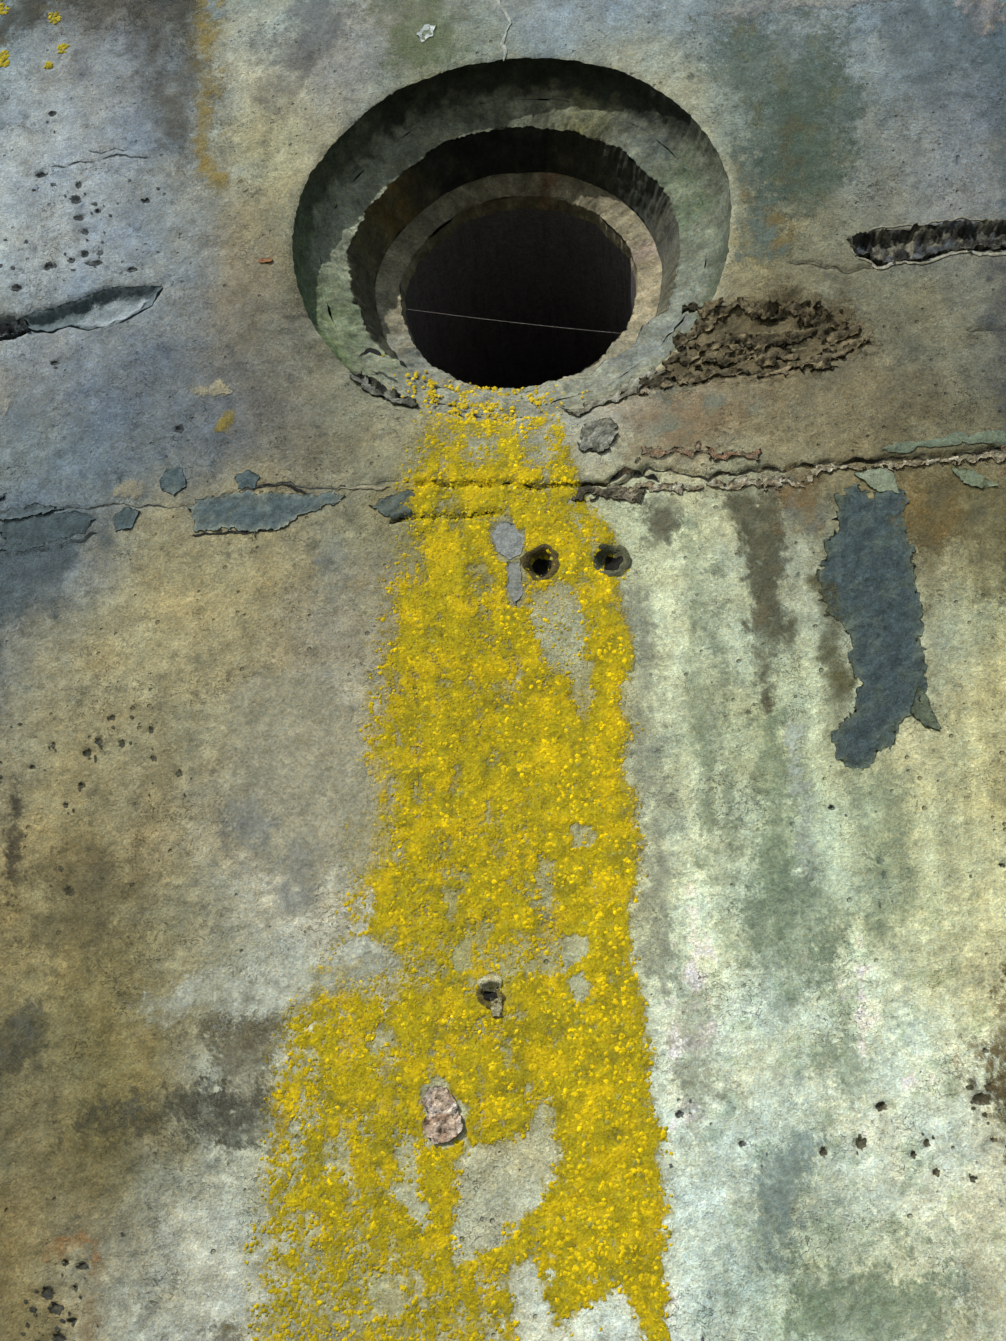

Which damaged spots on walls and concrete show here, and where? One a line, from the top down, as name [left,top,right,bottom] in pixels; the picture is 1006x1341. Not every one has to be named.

spalling [846,219,1006,266]
spalling [0,266,163,341]
spalling [349,371,419,408]
spalling [563,274,883,454]
peeling [0,495,96,552]
peeling [113,506,140,532]
crack [2,503,267,555]
peeling [159,455,345,537]
crack [224,480,397,497]
peeling [369,489,415,521]
crack [571,430,1006,504]
leakage [2,795,27,881]